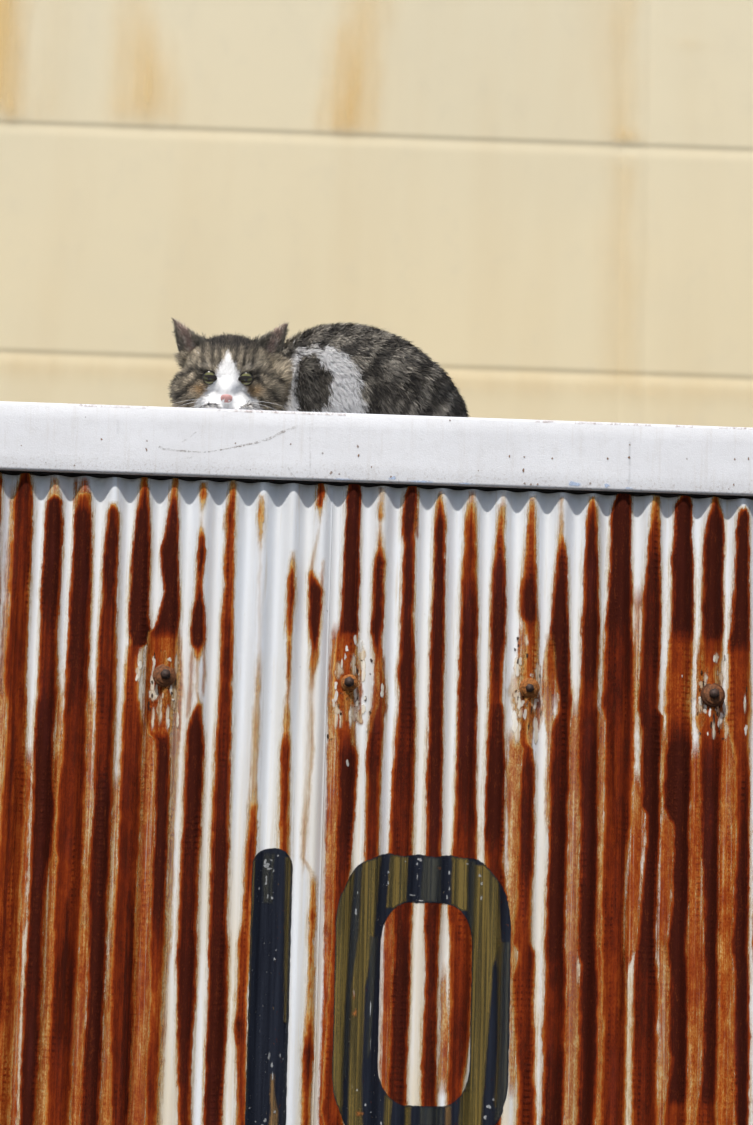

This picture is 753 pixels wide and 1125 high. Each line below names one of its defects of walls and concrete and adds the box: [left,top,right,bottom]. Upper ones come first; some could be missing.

peeling [135,650,179,728]
peeling [327,635,373,740]
peeling [512,636,541,744]
rust [0,473,291,1125]
rust [284,471,753,1125]